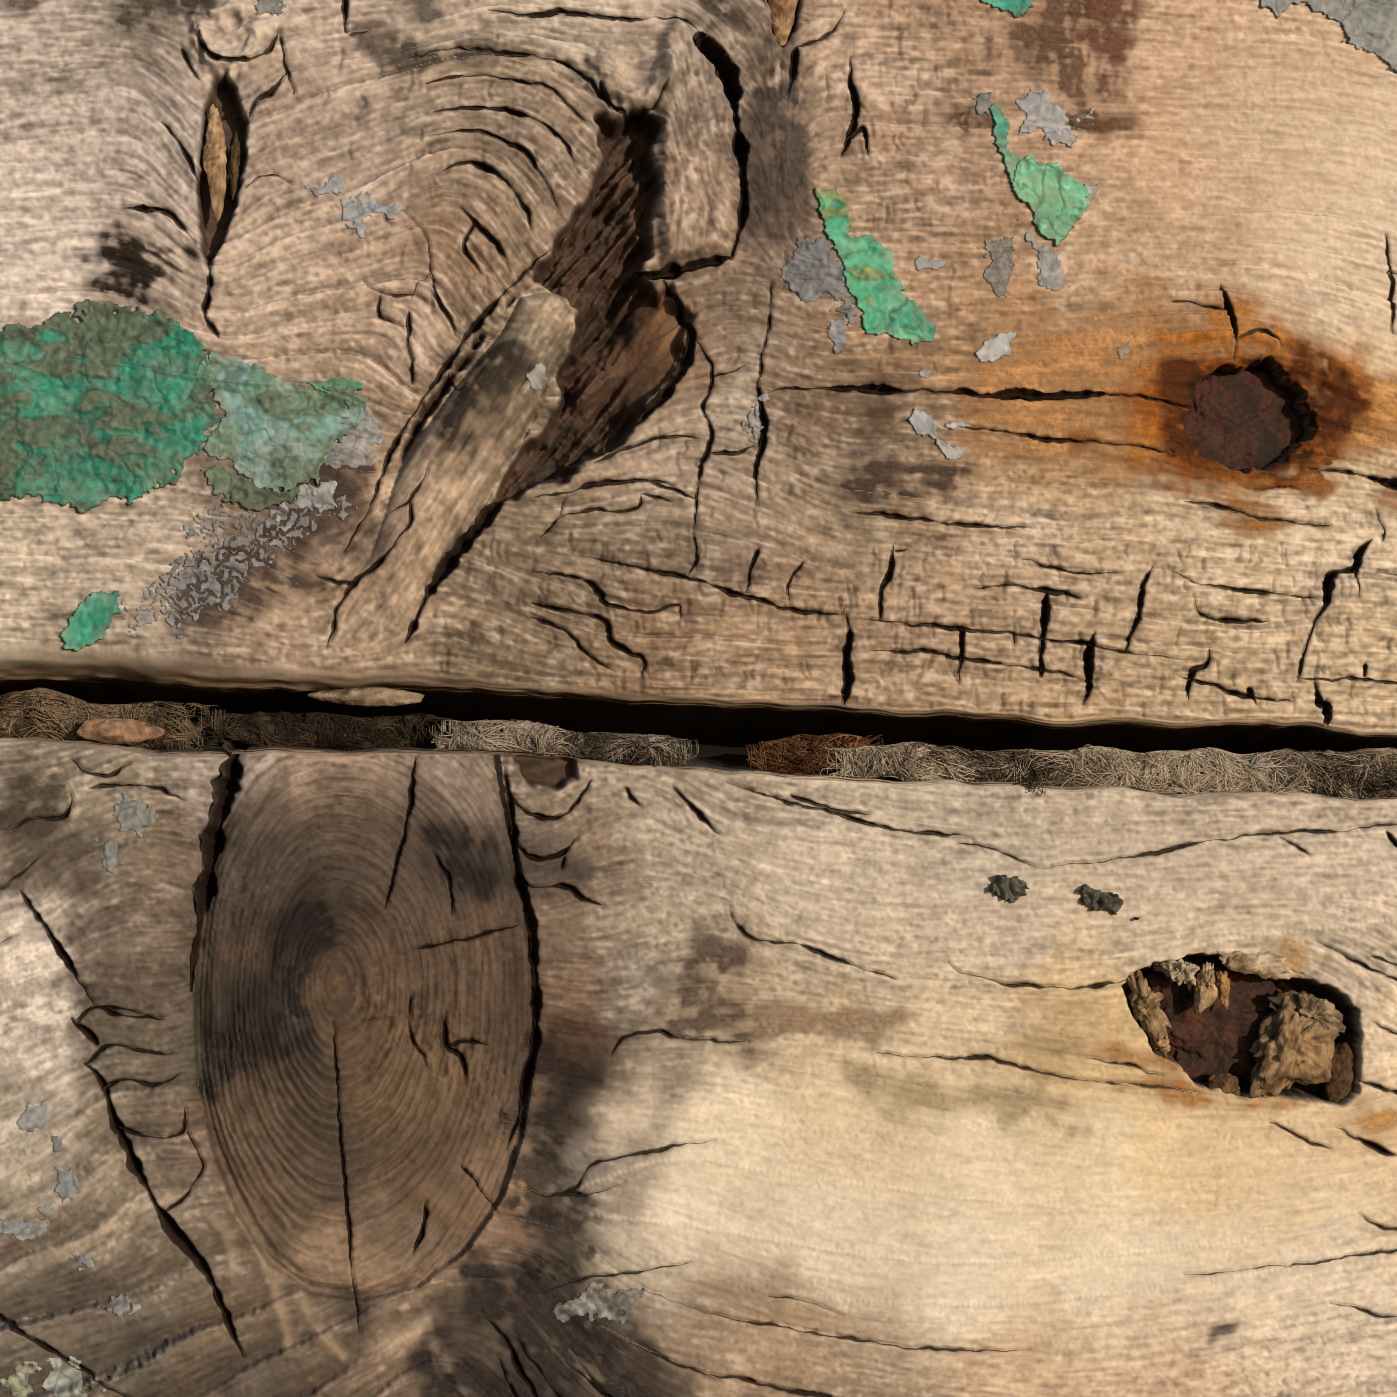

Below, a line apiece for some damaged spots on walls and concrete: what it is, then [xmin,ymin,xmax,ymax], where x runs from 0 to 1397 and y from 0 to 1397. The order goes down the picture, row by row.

peeling [980,0,1034,18]
peeling [1260,0,1397,73]
peeling [0,299,384,651]
crack [313,46,668,648]
peeling [781,187,936,353]
crack [405,7,1397,725]
peeling [973,89,1101,297]
corrosion [967,290,1397,534]
crack [11,740,253,992]
crack [385,757,602,1150]
crack [727,782,1397,868]
crack [0,855,244,1357]